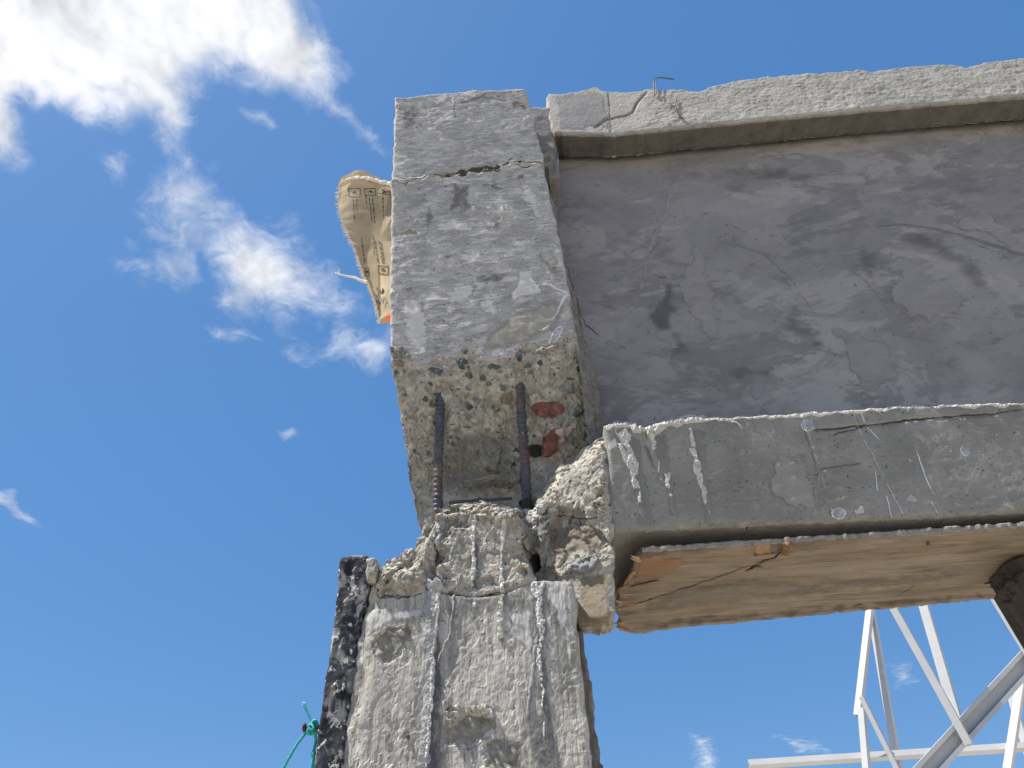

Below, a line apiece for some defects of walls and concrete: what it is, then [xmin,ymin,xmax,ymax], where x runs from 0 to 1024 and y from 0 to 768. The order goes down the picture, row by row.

crack [394,158,543,186]
water stain [649,247,724,351]
spalling [376,330,616,636]
water stain [606,405,920,526]
crack [802,410,1016,515]
water stain [366,502,571,768]